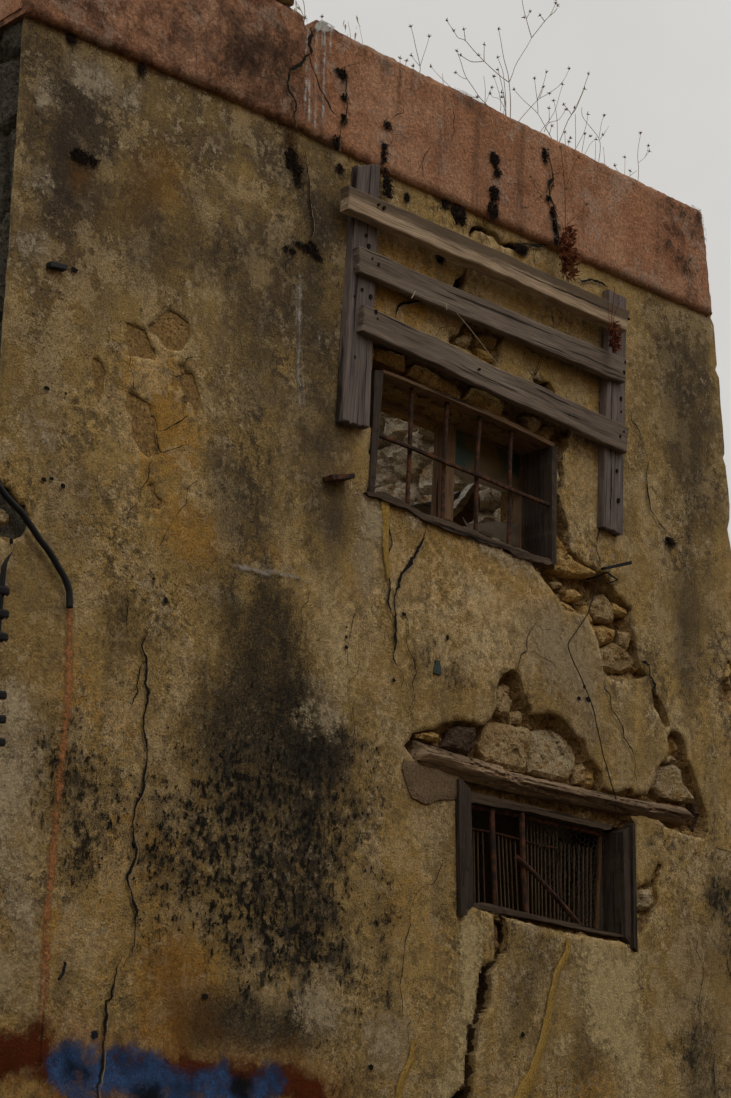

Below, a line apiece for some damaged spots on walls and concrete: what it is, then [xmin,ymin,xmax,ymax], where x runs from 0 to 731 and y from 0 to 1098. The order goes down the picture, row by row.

crack [285,27,360,270]
flaking render [371,341,570,487]
crack [381,501,429,722]
flaking render [534,504,640,681]
rust [38,607,74,1026]
crack [97,595,156,1098]
leakage [0,565,413,1098]
crack [514,939,571,1098]
flaking render [486,911,621,942]
flaking render [404,672,705,839]